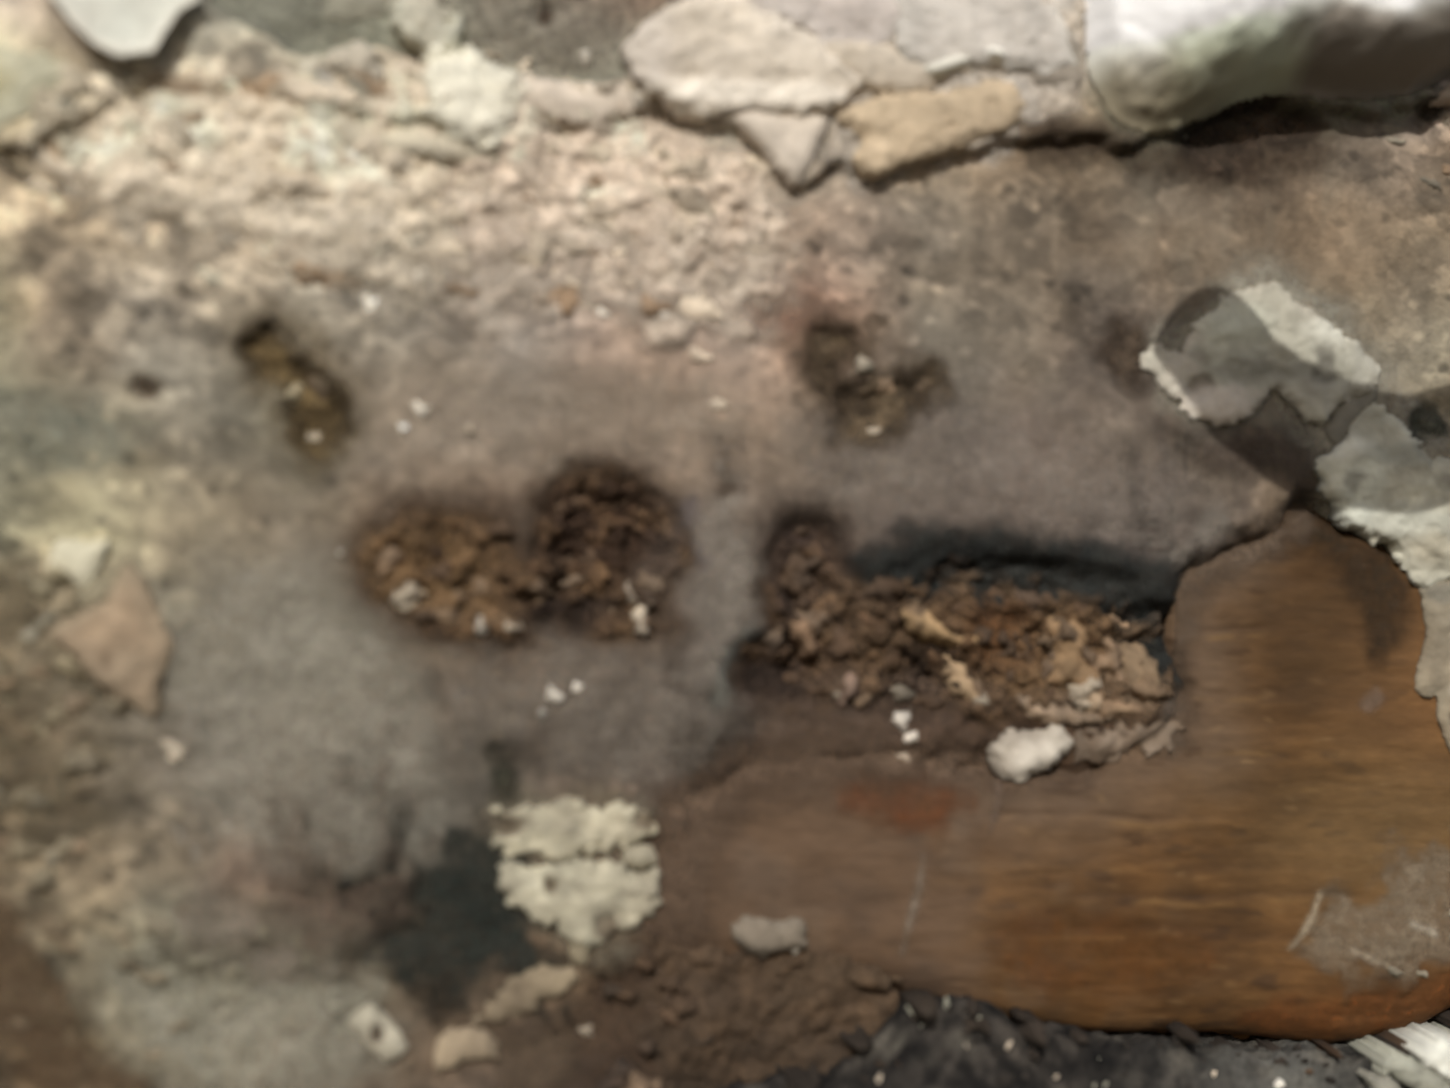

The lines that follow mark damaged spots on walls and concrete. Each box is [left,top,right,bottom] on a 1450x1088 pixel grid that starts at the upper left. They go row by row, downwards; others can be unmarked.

spalling [0,0,1087,364]
hole [238,316,356,460]
hole [800,324,951,447]
hole [351,452,697,661]
hole [725,515,1175,734]
leakage [109,565,577,1088]